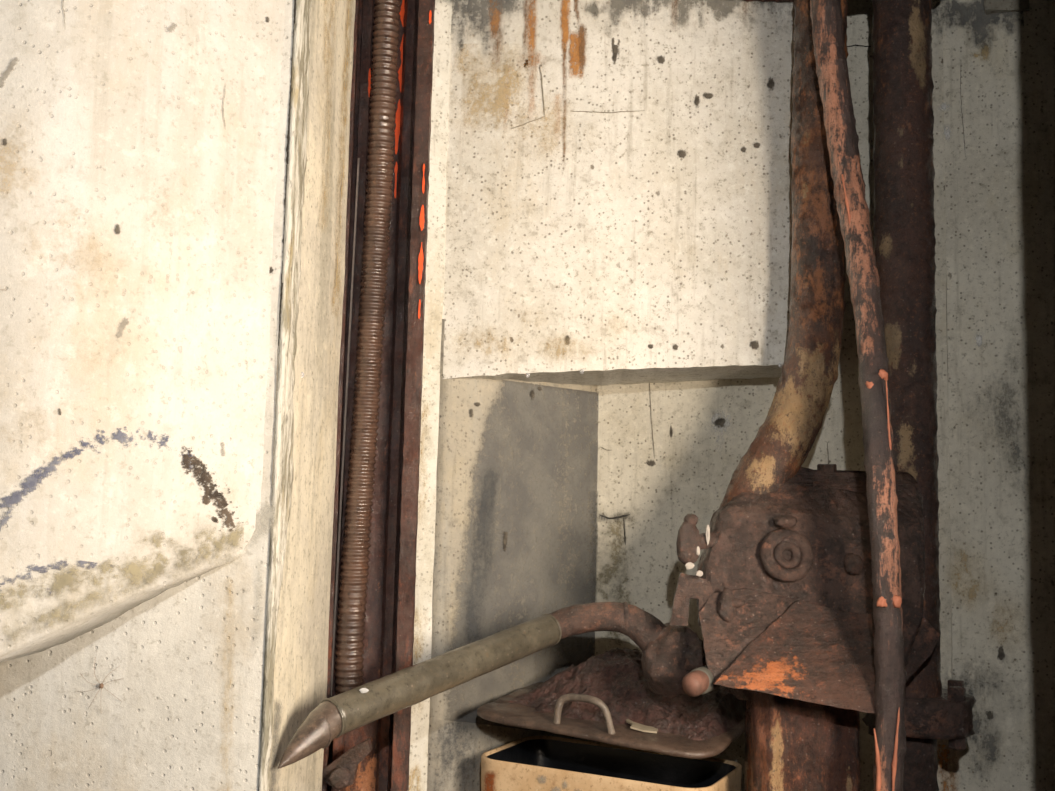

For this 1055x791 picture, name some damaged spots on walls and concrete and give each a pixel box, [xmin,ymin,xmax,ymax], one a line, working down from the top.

rust [489,0,502,55]
rust [523,0,538,77]
rust [561,0,586,80]
leakage [452,380,599,650]
leakage [434,632,595,788]